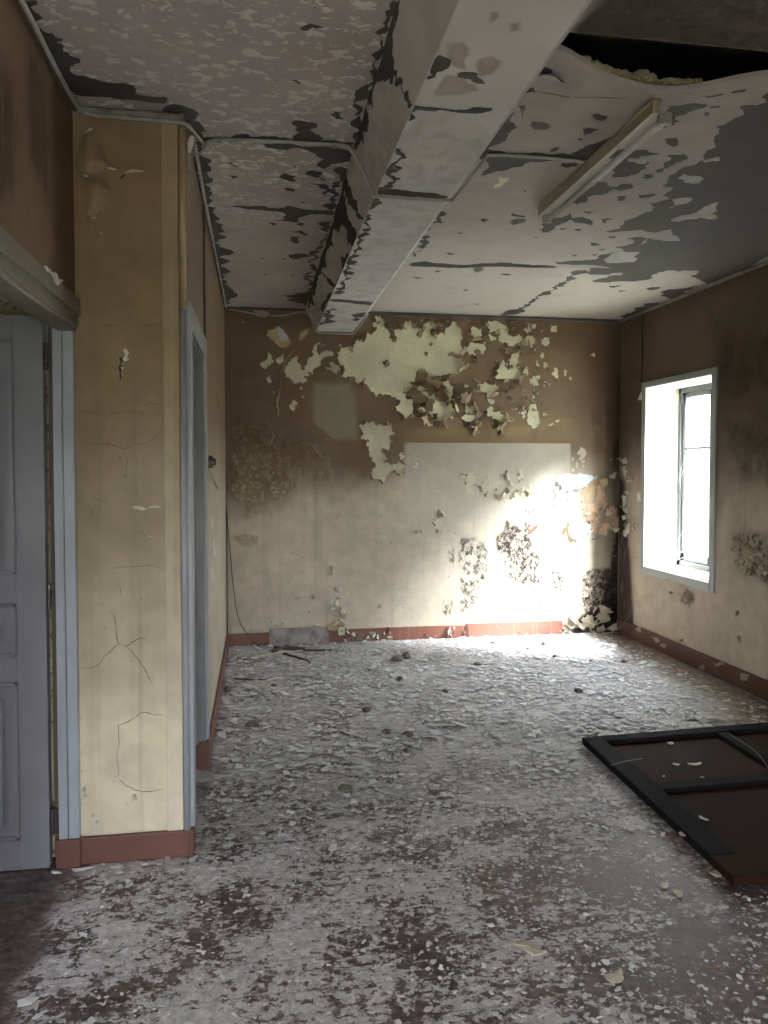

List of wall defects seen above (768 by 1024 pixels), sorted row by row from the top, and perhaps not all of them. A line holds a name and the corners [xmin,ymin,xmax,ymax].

peeling [25,0,768,484]
mould [444,509,564,614]
peeling [555,447,637,543]
damp [565,441,633,633]
crack [91,565,162,683]
crack [115,712,164,792]
peeling [17,554,768,1024]